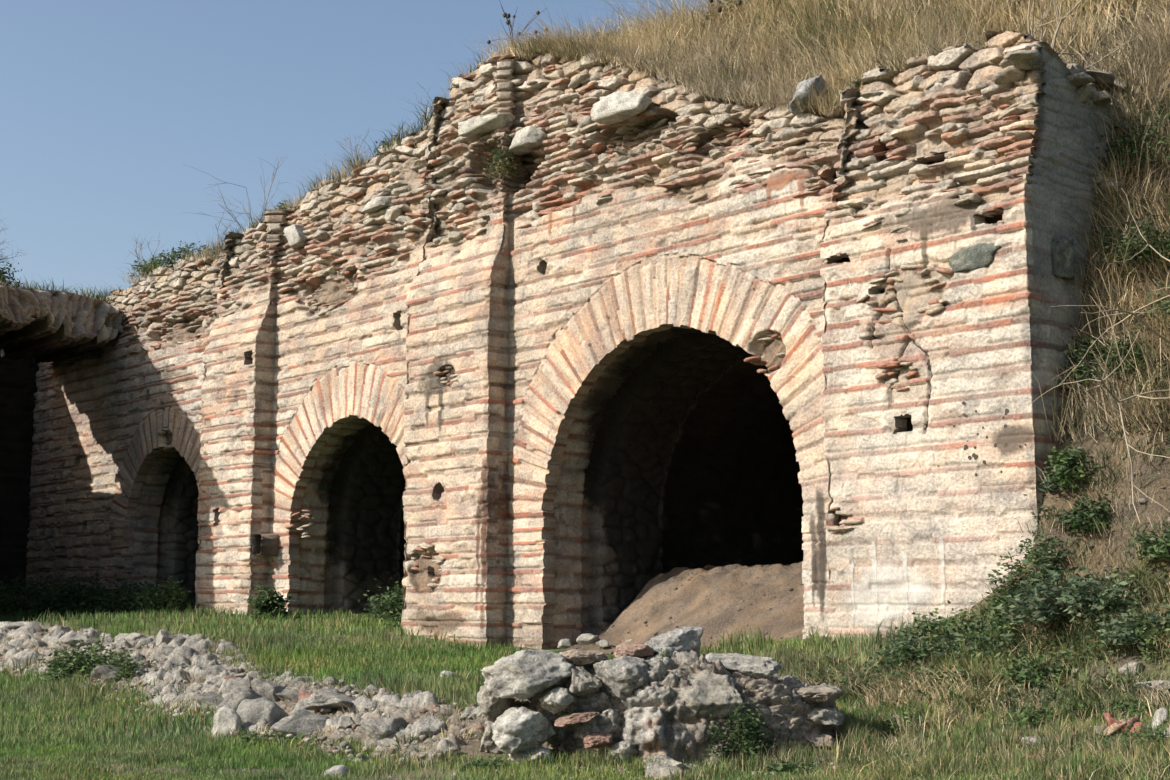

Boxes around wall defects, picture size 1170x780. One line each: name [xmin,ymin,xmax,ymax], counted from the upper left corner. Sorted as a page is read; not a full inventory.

spalling [744,333,786,374]
crack [870,250,933,430]
leakage [809,491,827,610]